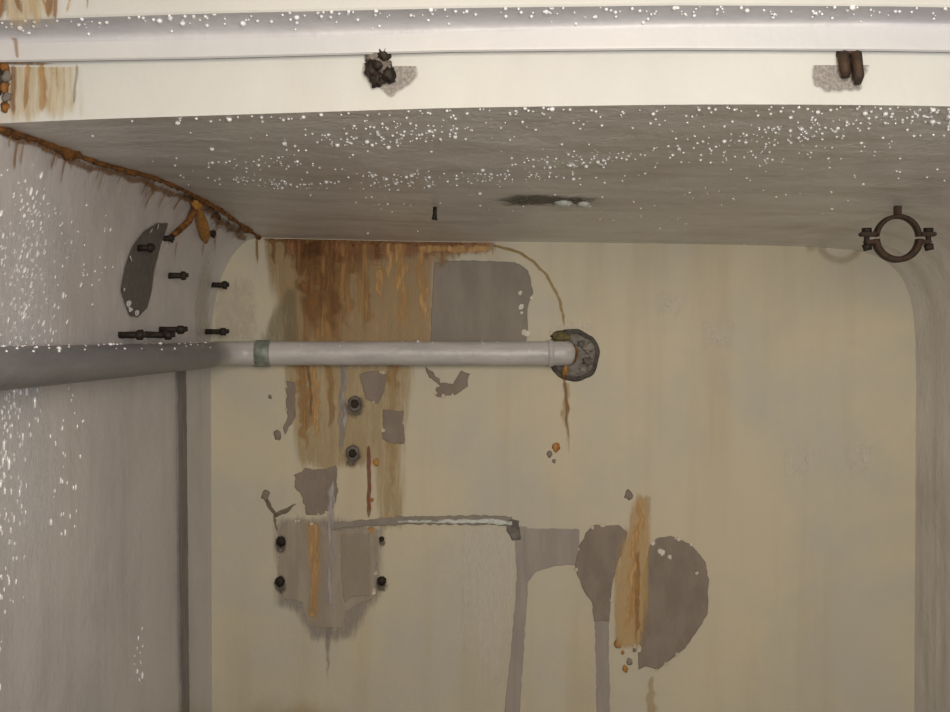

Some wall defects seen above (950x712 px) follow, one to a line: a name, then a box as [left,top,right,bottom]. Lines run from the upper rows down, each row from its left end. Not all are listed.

rust [11,54,53,114]
peeling [121,223,168,317]
rust [169,199,225,252]
rust [256,238,493,341]
peeling [430,260,533,341]
leakage [499,195,591,209]
rust [290,365,407,533]
rust [547,442,560,463]
spalling [278,465,378,664]
spalling [574,523,627,622]
rust [614,489,649,673]
spalling [637,536,709,671]